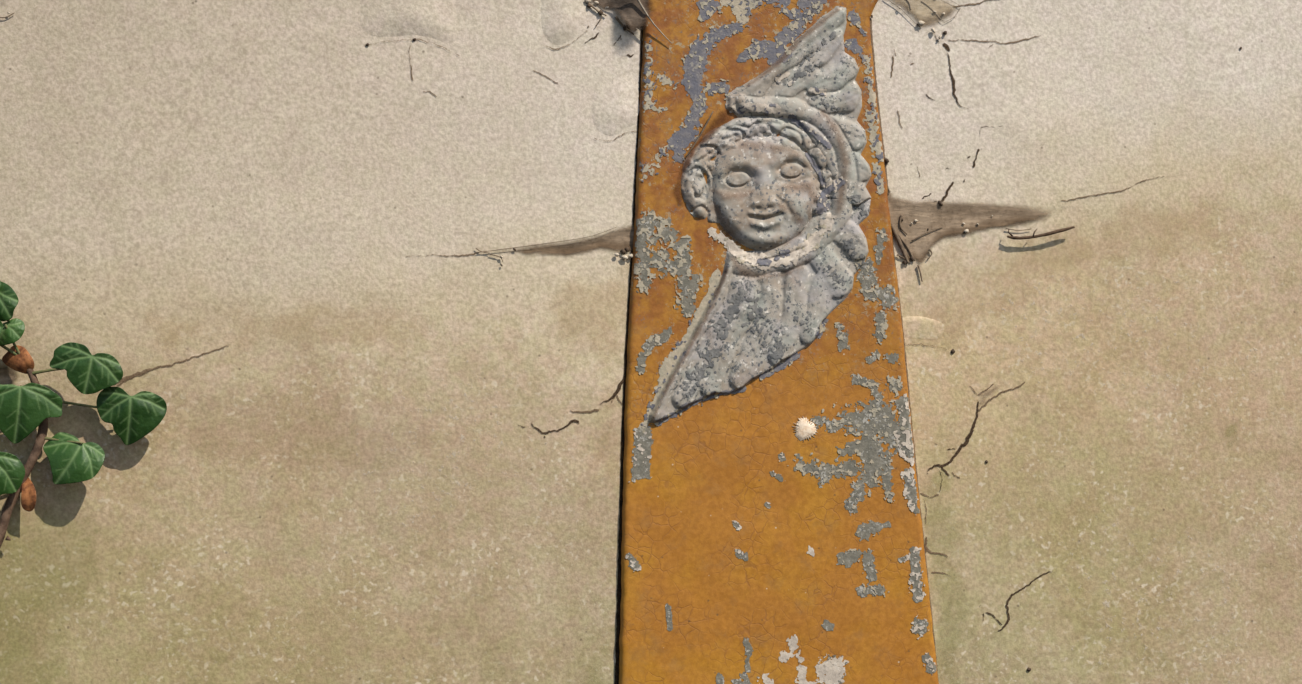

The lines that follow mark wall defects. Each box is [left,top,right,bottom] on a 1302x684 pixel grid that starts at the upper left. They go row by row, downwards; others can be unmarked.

crack [870,0,1038,202]
crack [406,250,477,258]
peeling [629,0,920,598]
crack [518,26,643,684]
crack [892,234,1025,681]
peeling [821,620,835,631]
crack [983,571,1051,631]
peeling [716,637,774,684]
peeling [779,634,849,684]